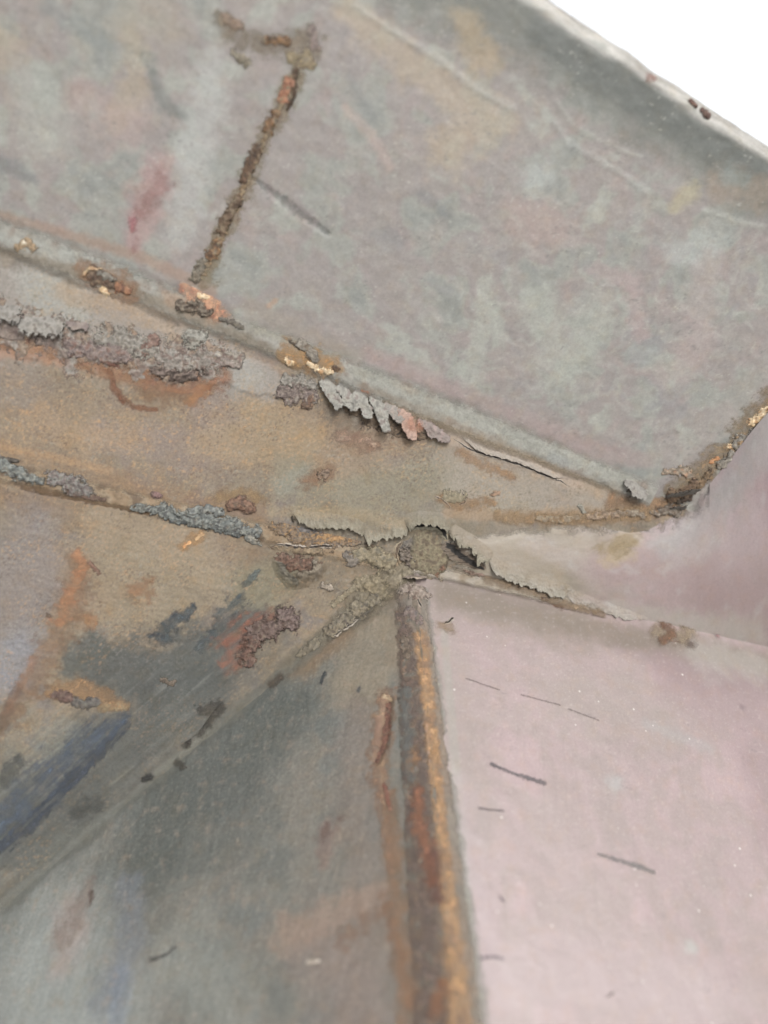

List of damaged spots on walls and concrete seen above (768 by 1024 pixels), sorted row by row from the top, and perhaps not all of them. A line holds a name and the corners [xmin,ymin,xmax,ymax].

rust [0,9,322,406]
rust [0,455,263,551]
rust [273,338,359,426]
peeling [319,377,451,443]
crack [454,433,569,486]
rust [495,387,768,526]
peeling [449,524,650,621]
rust [45,678,129,711]
rust [184,701,224,749]
rust [222,539,472,1024]